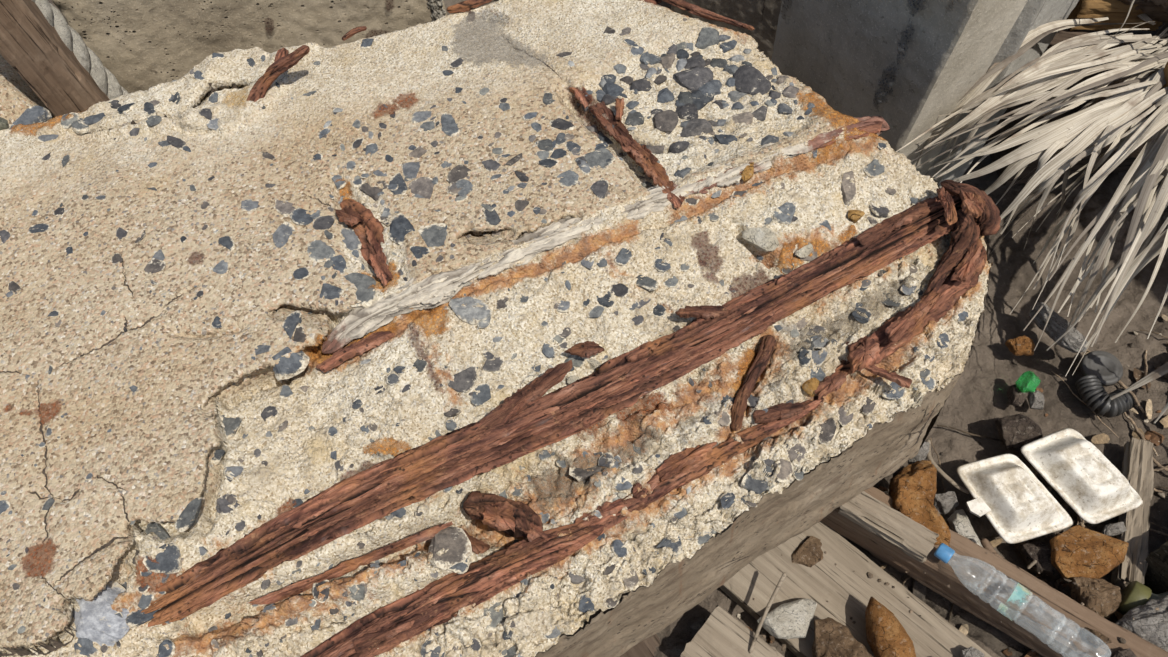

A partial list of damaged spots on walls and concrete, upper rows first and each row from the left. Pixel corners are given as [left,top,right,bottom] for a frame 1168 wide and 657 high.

spalling [10,42,320,149]
rust [222,45,310,106]
spalling [564,27,816,189]
rust [640,0,755,30]
rust [308,87,890,390]
crack [0,263,195,657]
spalling [0,126,991,657]
rust [135,180,1001,657]
rust [21,539,56,578]